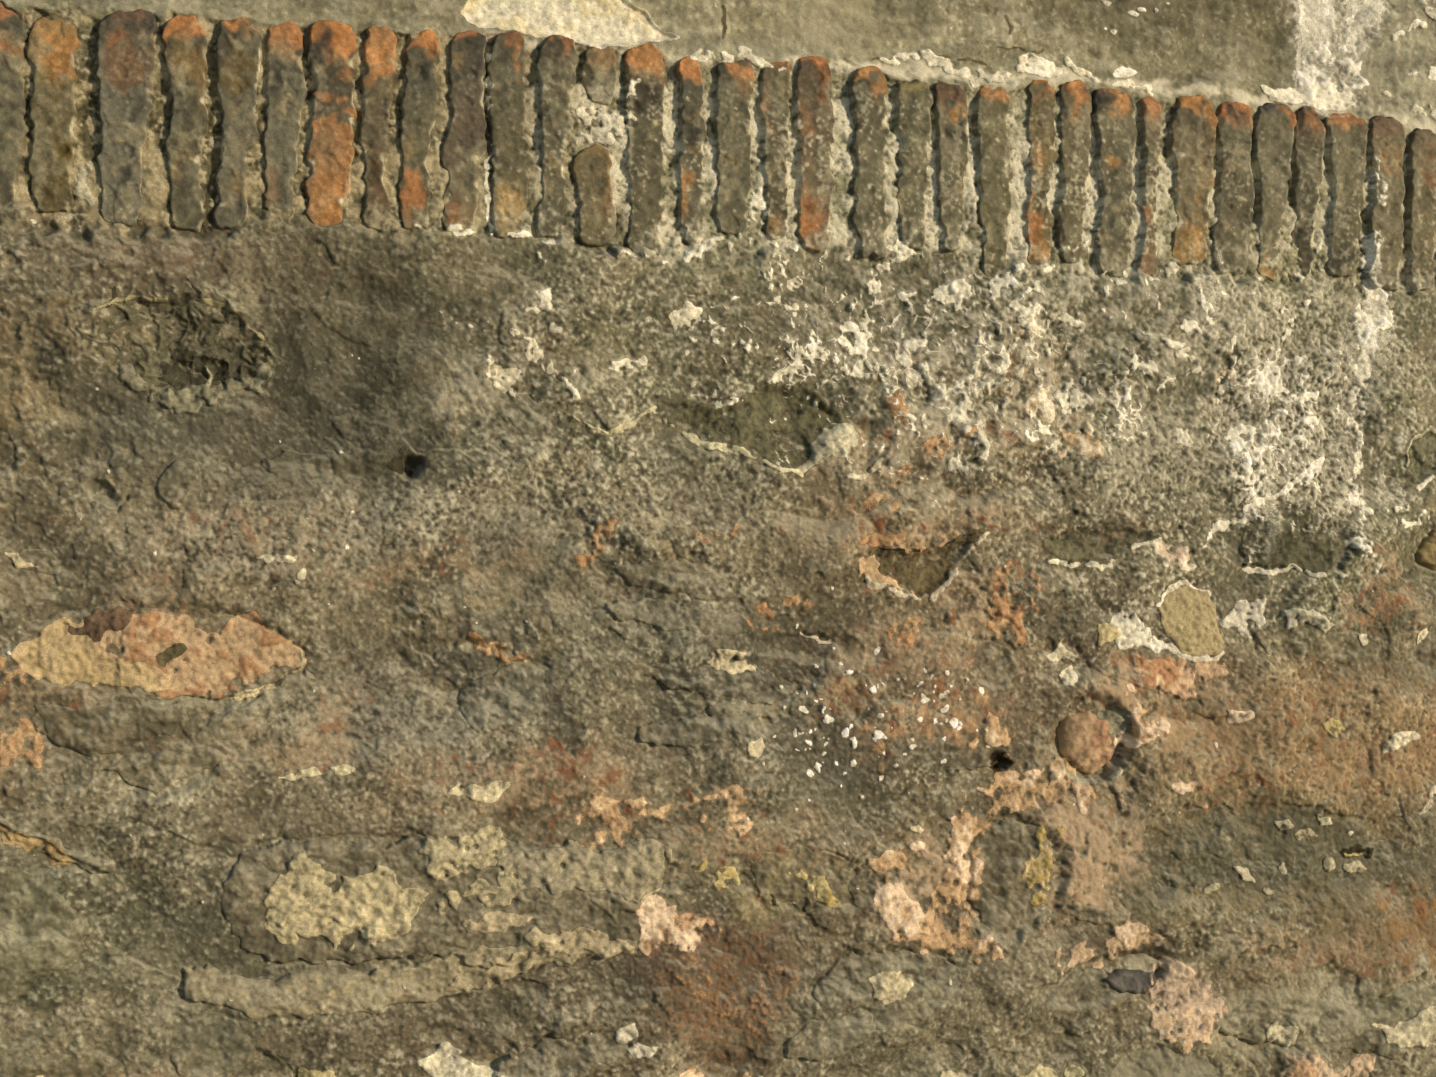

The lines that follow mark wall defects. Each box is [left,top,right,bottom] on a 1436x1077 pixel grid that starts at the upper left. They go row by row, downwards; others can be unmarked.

spalling [460,0,680,50]
crack [714,2,727,39]
peeling [690,46,786,71]
efflorescence [1260,0,1436,117]
efflorescence [1411,103,1436,120]